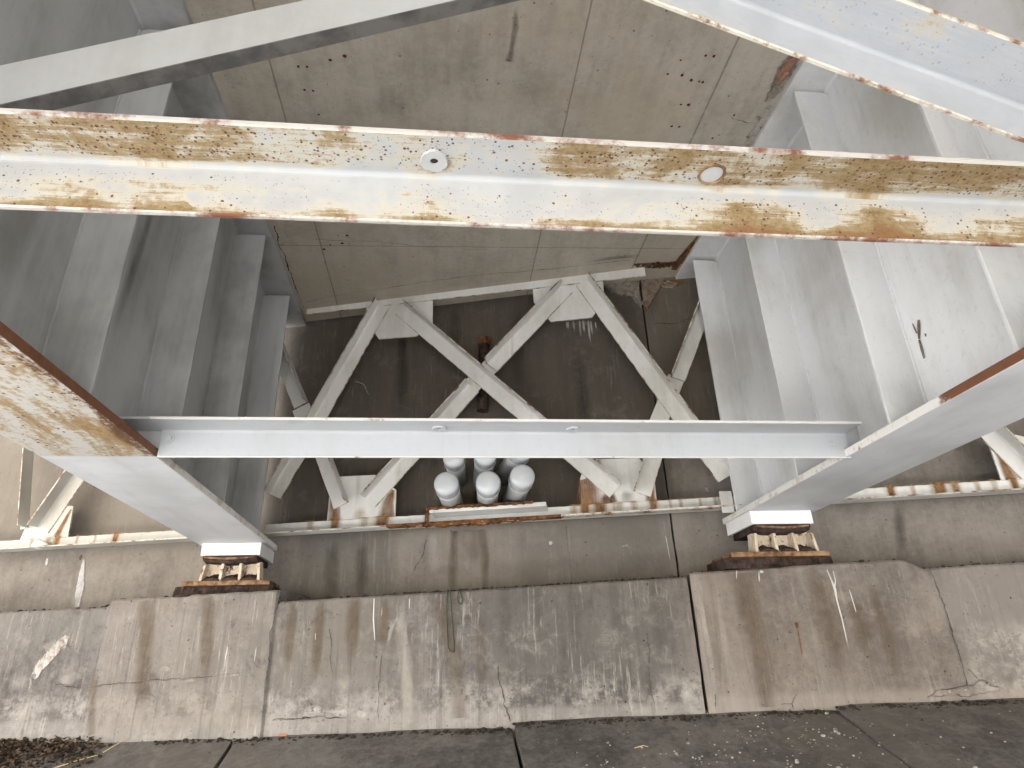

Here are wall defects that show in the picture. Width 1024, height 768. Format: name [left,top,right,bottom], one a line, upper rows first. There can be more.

spalling [741,55,800,147]
rust [634,236,699,286]
rust [330,501,339,528]
rust [377,478,733,573]
rust [933,481,959,493]
crack [930,570,976,688]